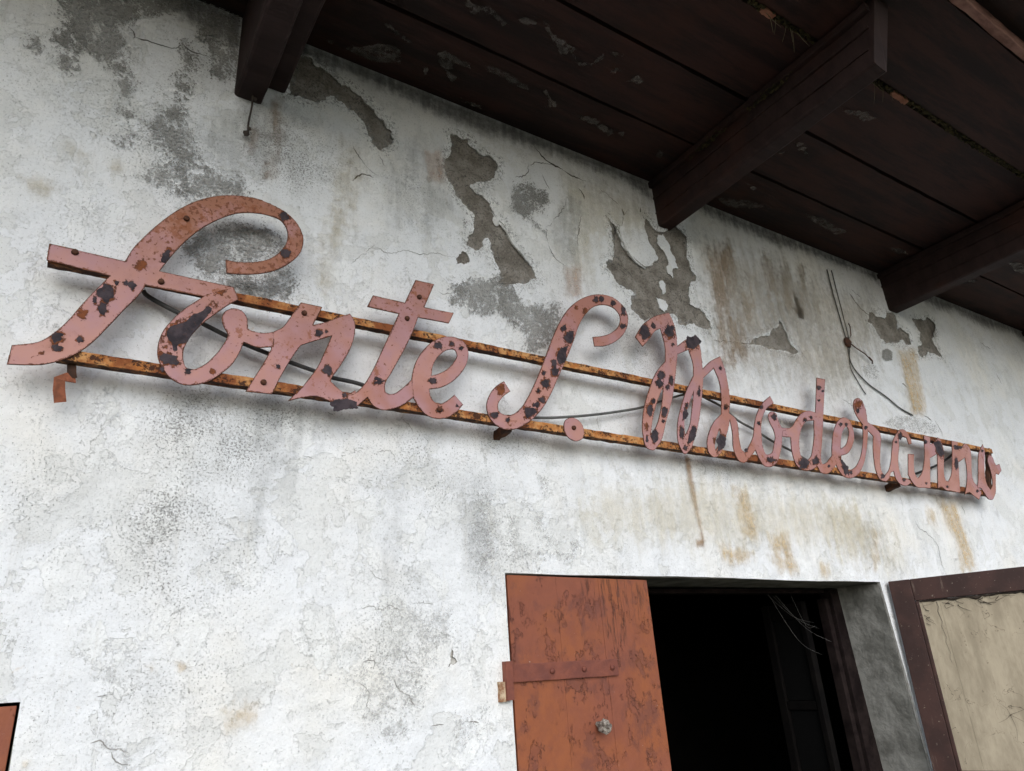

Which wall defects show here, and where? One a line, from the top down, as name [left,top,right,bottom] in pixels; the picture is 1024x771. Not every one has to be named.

flaking render [289,58,396,150]
flaking render [440,133,565,354]
crack [517,149,641,266]
flaking render [603,208,710,330]
flaking render [741,321,797,354]
flaking render [868,311,941,361]